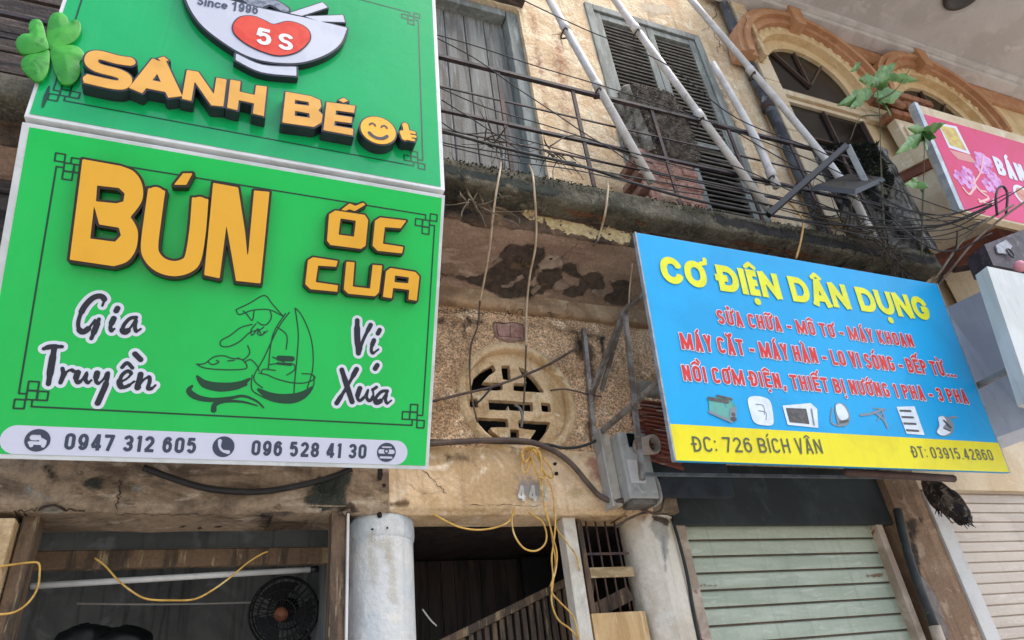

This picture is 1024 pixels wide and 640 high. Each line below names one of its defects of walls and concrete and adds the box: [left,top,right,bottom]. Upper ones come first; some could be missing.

leakage [444,164,560,216]
peeling [520,207,632,247]
spalling [456,244,631,305]
spalling [492,321,525,343]
crack [112,479,231,522]
leakage [305,473,351,512]